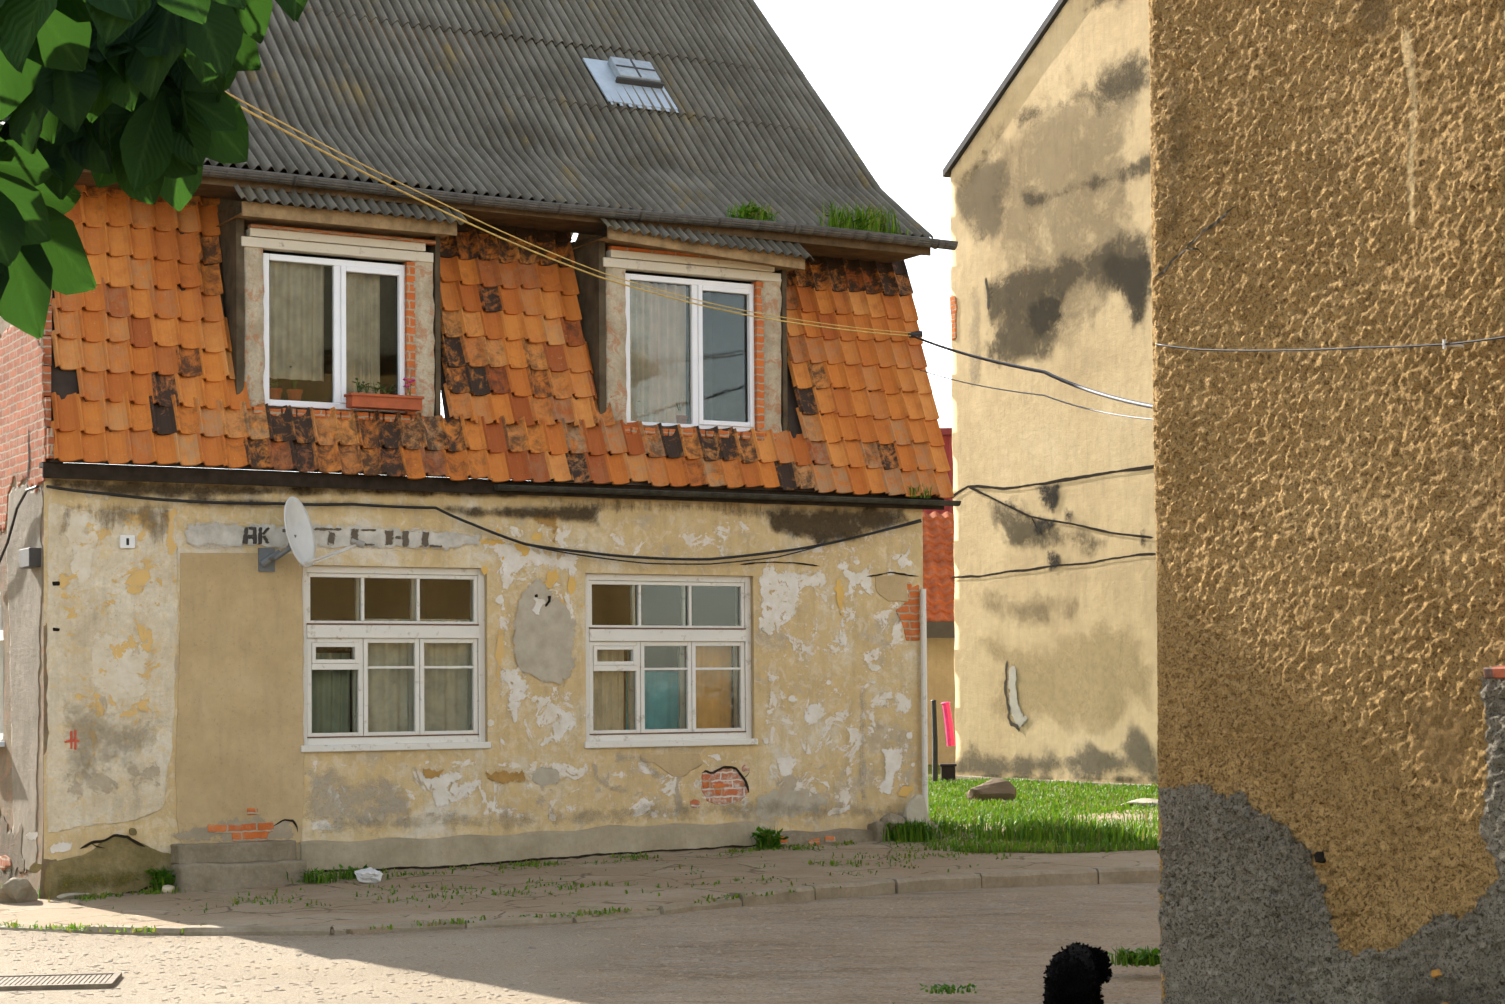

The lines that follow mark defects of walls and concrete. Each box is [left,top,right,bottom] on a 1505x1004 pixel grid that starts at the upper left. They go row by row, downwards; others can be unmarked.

water stain [1083,59,1150,108]
water stain [1090,156,1151,189]
water stain [956,161,1005,240]
water stain [1023,193,1044,206]
water stain [988,233,1151,361]
peeling [0,325,179,886]
peeling [312,521,943,841]
spalling [174,808,294,843]
spalling [1314,851,1326,863]